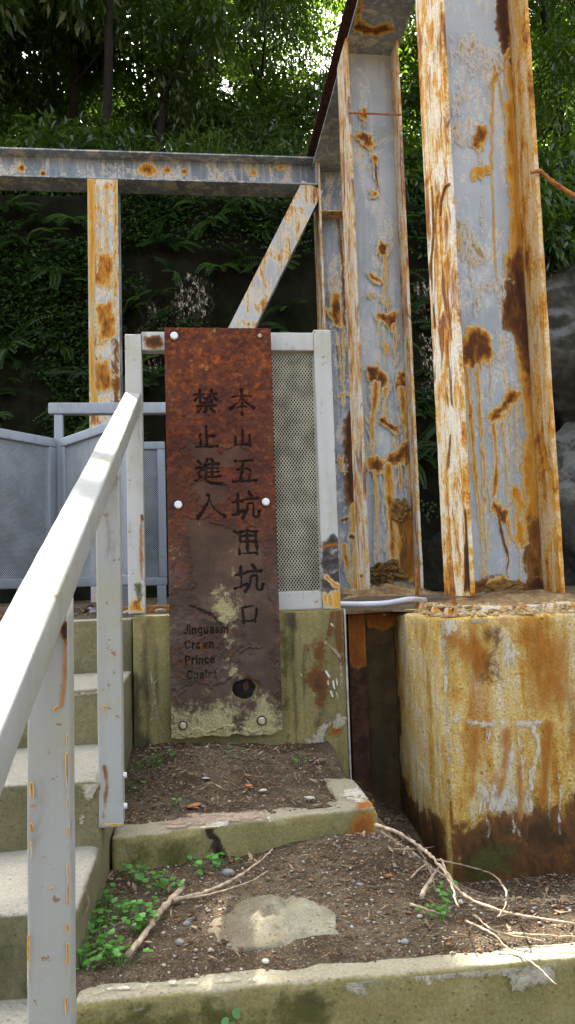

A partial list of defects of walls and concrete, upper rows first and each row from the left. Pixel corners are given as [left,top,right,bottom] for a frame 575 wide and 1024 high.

rust [17,163,46,176]
rust [130,161,188,178]
rust [353,106,381,199]
rust [87,179,120,403]
rust [461,0,544,593]
rust [304,219,415,707]
rust [53,621,67,711]
rust [444,630,486,694]
crack [205,828,227,859]
leakage [400,714,575,882]
rust [498,728,522,819]
rust [540,721,553,806]